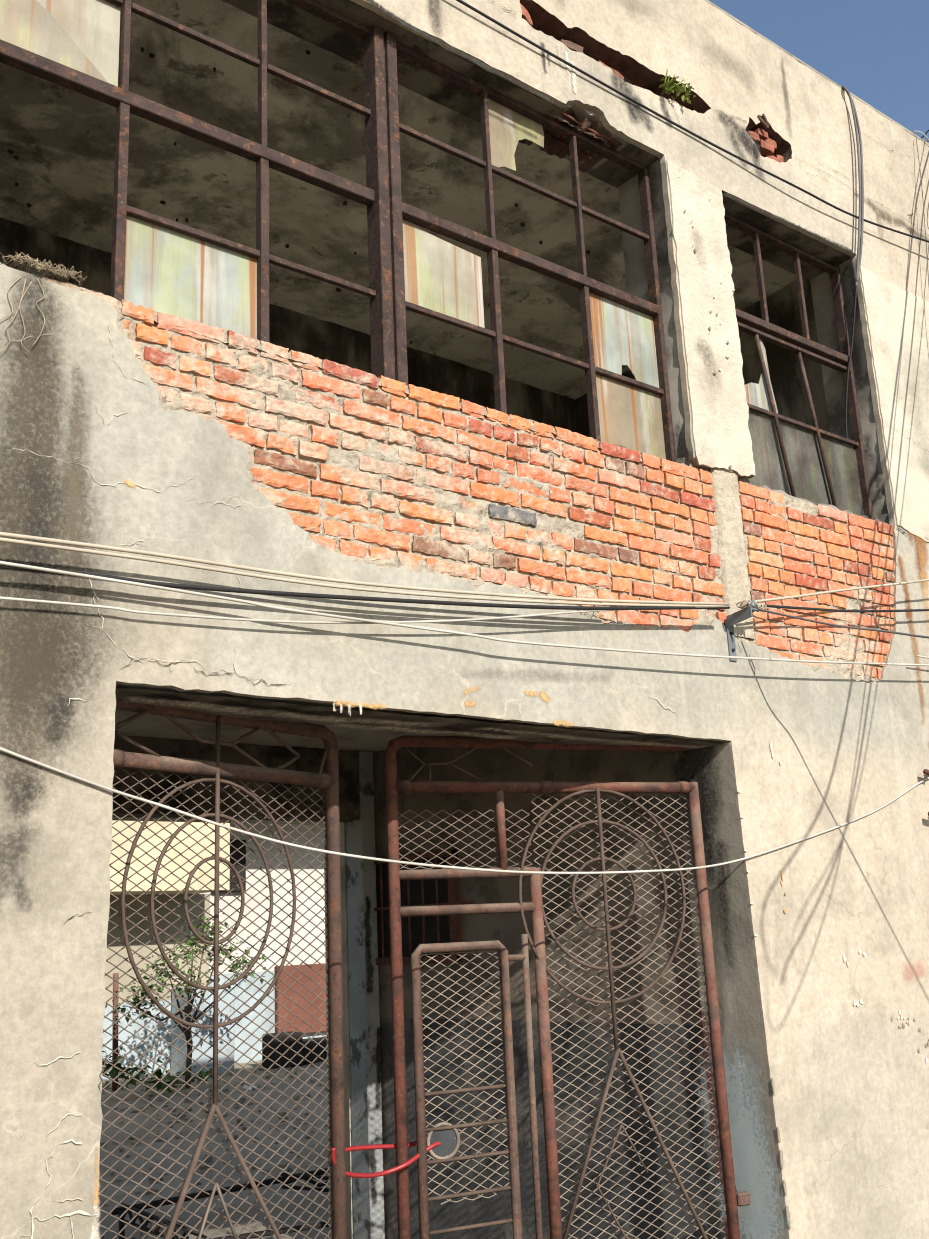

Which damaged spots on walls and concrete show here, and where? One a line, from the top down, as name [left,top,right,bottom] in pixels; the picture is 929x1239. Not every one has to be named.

spalling [520,4,533,26]
spalling [560,39,583,53]
spalling [747,113,784,162]
damp [0,274,85,782]
spalling [42,277,895,683]
crack [86,579,290,686]
rust [899,533,928,706]
crack [18,1052,107,1239]